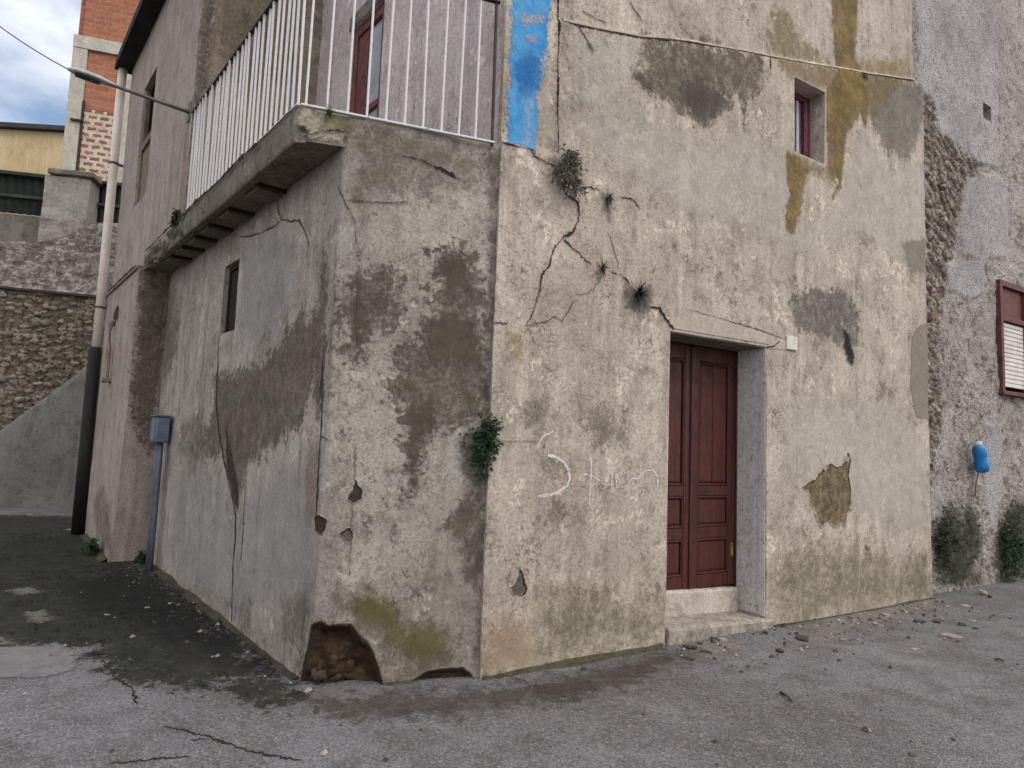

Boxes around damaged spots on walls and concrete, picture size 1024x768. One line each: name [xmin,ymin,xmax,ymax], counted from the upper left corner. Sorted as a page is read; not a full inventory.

crack [107,112,345,292]
crack [492,0,715,329]
damp [632,0,923,235]
damp [204,250,335,511]
damp [379,230,497,505]
crack [693,310,785,348]
damp [787,287,860,355]
crack [216,340,246,622]
spalling [300,619,386,693]
spalling [345,480,364,505]
spalling [509,568,528,596]
spalling [802,451,854,529]